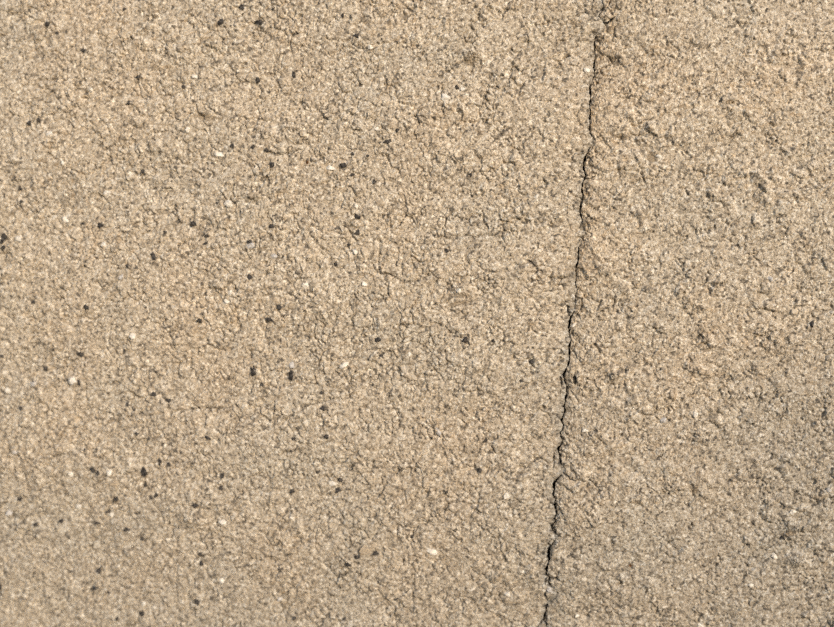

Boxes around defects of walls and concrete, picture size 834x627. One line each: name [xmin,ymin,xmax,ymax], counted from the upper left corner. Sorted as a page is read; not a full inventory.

crack [579,0,615,224]
crack [538,245,580,627]